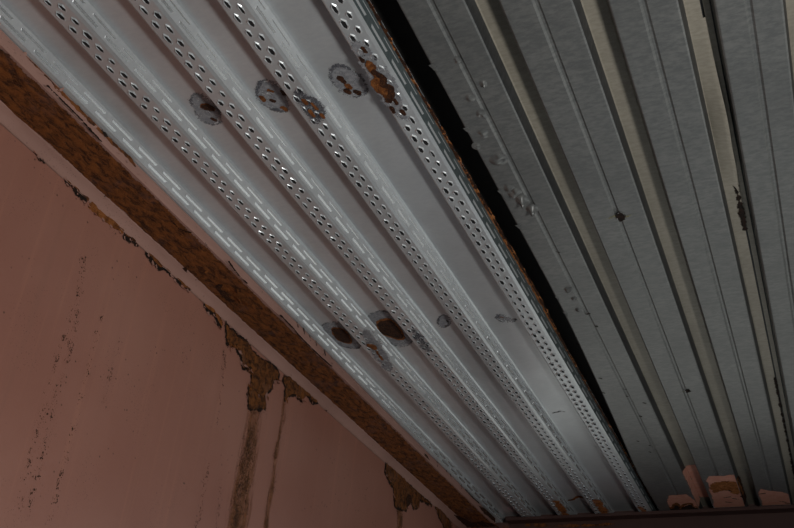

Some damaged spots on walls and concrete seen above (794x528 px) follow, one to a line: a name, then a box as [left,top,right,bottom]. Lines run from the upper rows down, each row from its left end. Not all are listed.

corrosion [0,41,499,528]
corrosion [366,0,658,513]